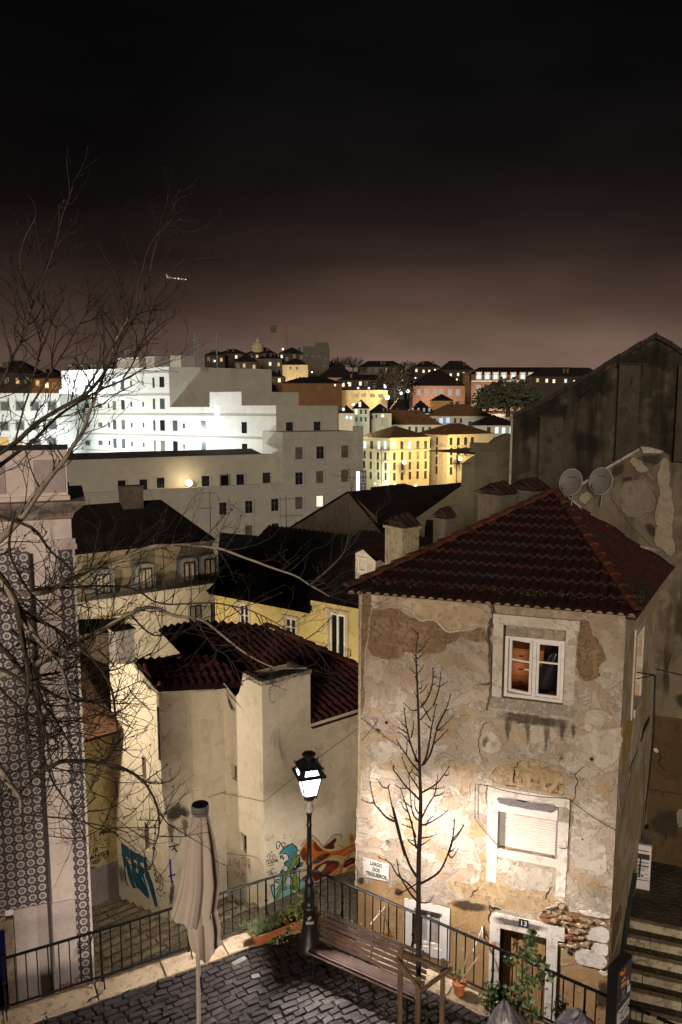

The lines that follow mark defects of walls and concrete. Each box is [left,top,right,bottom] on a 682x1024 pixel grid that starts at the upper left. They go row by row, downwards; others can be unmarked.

flaking render [619,456,676,557]
flaking render [575,618,607,682]
flaking render [355,594,490,886]
damp [506,713,575,743]
flaking render [435,708,640,966]